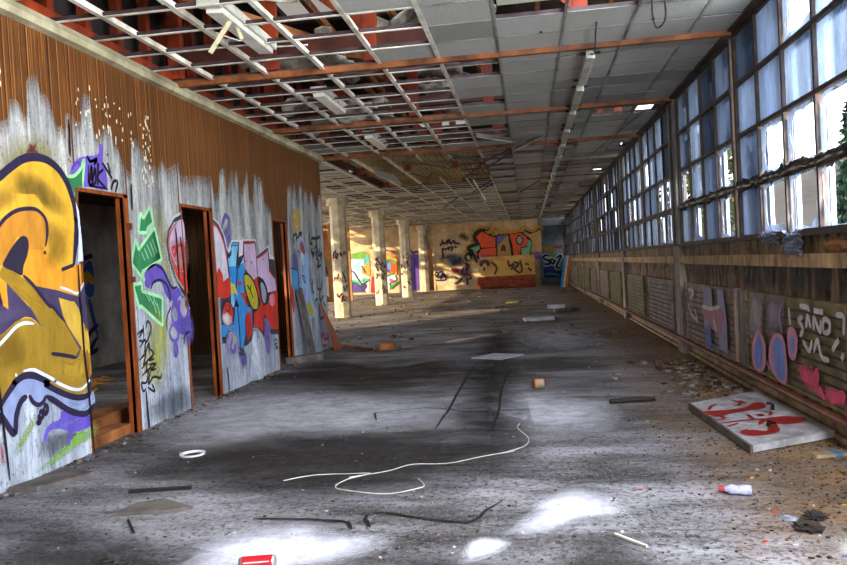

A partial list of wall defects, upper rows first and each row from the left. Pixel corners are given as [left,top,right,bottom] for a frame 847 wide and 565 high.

peeling [0,84,280,430]
peeling [287,184,330,356]
peeling [0,393,92,494]
crack [374,360,529,430]